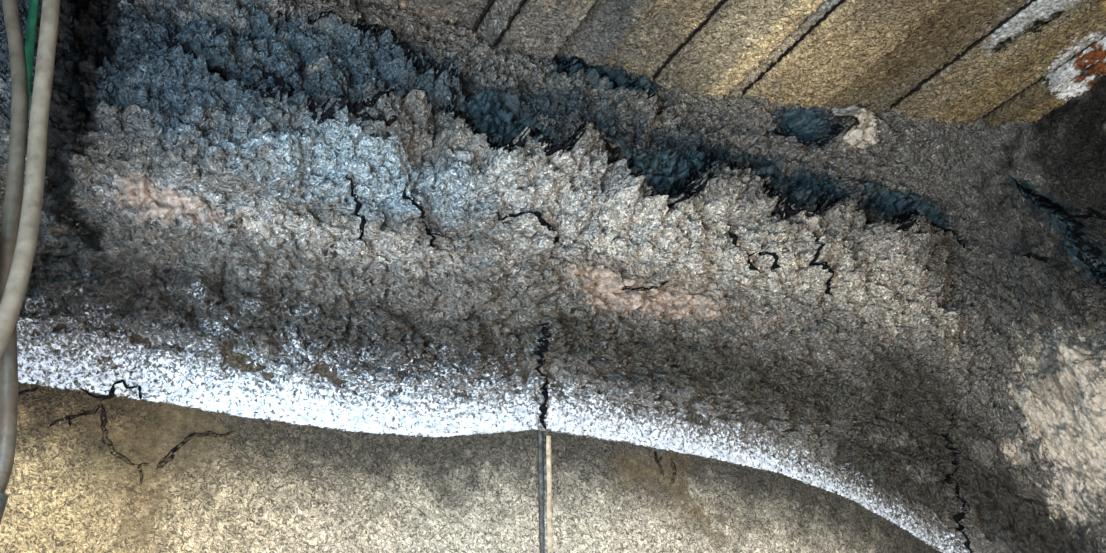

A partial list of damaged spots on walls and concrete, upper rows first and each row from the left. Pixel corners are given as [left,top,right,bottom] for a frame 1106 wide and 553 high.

corrosion [1067,42,1106,89]
crack [160,10,965,296]
spalling [773,102,881,153]
crack [533,322,561,429]
crack [47,379,235,487]
crack [941,409,973,553]